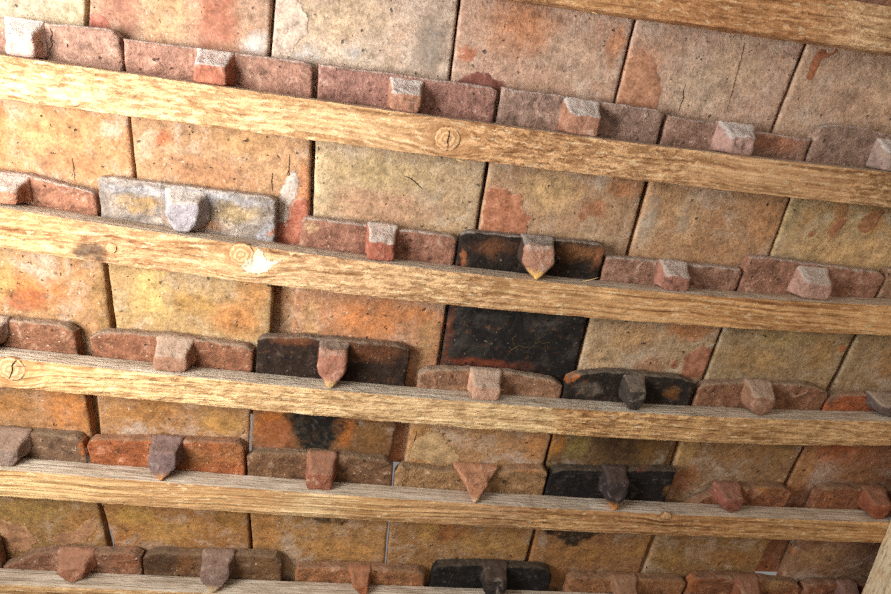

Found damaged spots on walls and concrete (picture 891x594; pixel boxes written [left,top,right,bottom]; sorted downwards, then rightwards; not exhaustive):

peeling [276,172,309,245]